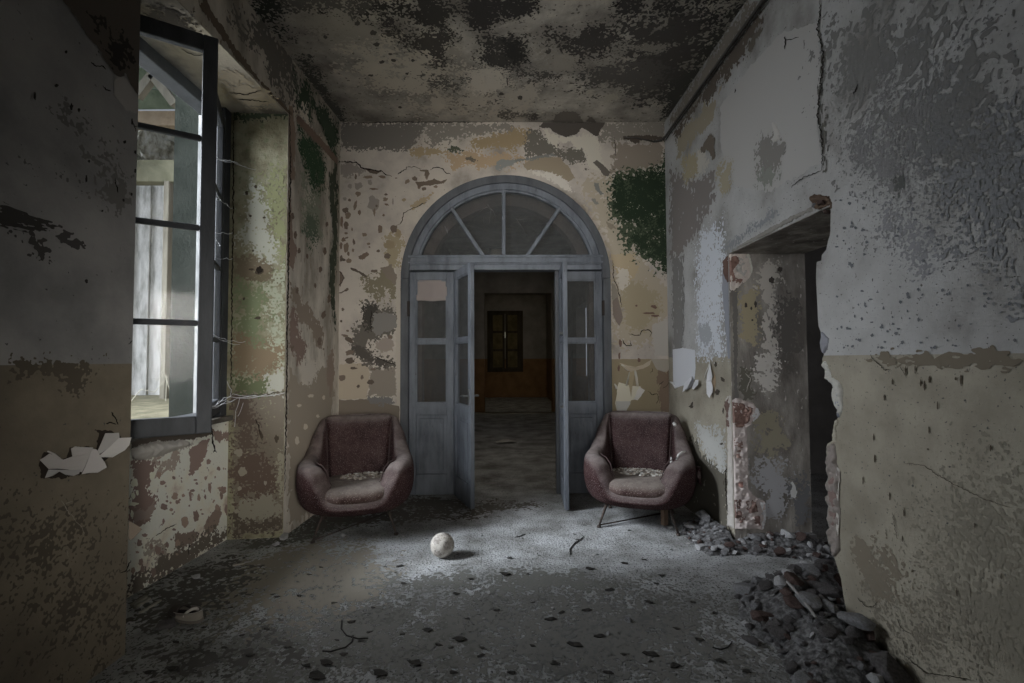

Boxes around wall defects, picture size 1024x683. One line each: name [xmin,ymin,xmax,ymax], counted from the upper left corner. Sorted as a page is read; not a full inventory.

peeling [39,0,400,575]
peeling [326,168,447,291]
crack [344,161,450,176]
water stain [218,0,812,530]
peeling [523,157,575,182]
spalling [539,111,605,137]
crack [784,1,824,188]
peeling [615,339,640,411]
peeling [656,348,696,412]
spalling [712,194,832,530]
spalling [820,332,843,557]